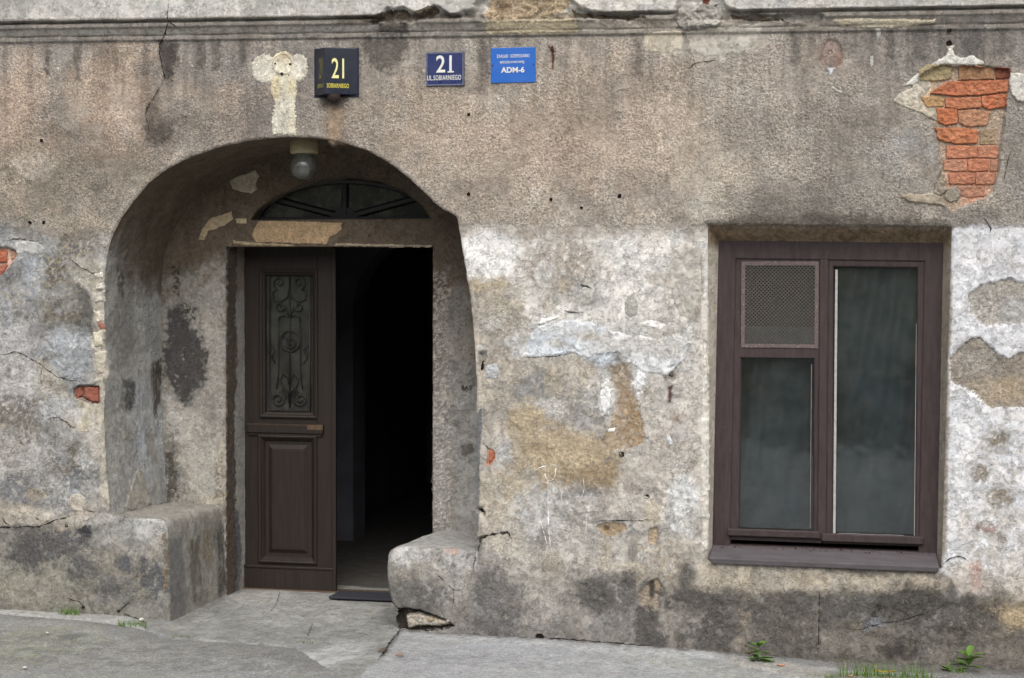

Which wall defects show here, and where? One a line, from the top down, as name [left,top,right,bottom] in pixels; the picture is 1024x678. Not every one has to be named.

crack [143,2,179,144]
spalling [893,27,1024,213]
crack [1,351,80,383]
peeling [73,272,107,404]
peeling [198,212,432,595]
peeling [523,315,691,457]
peeling [950,277,1024,409]
crack [0,509,93,528]
crack [473,531,512,569]
water stain [575,575,741,652]
water stain [754,588,883,657]
water stain [995,605,1024,629]